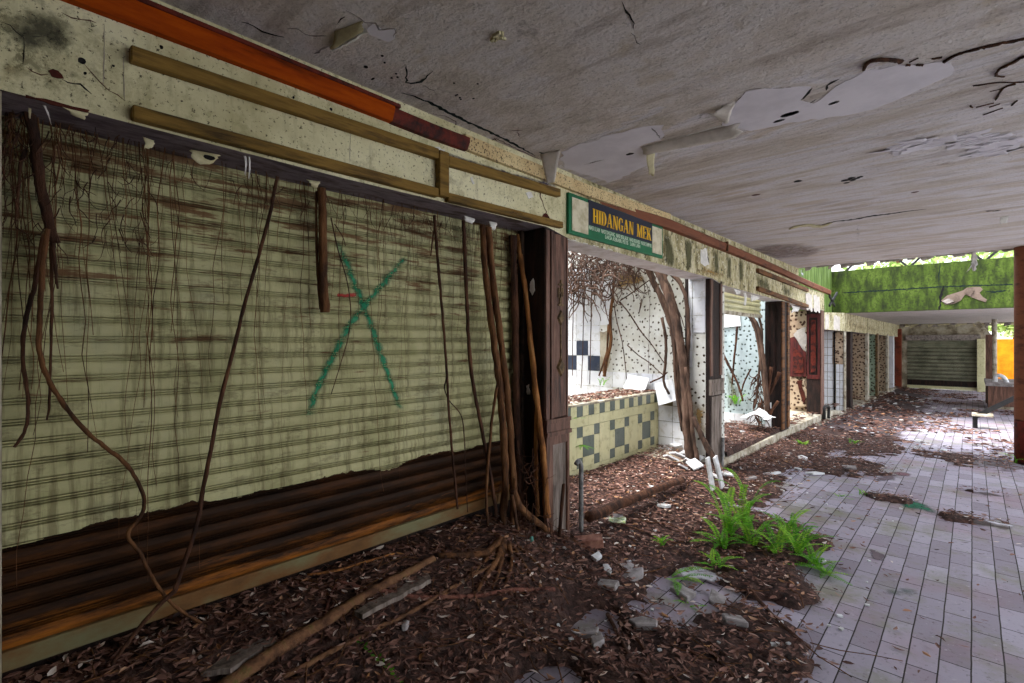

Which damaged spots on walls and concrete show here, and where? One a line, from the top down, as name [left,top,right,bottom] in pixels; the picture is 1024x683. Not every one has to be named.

mould [13,16,68,47]
peeling [314,10,397,54]
crack [622,2,639,44]
crack [403,67,543,158]
peeling [708,62,954,131]
peeling [559,125,664,183]